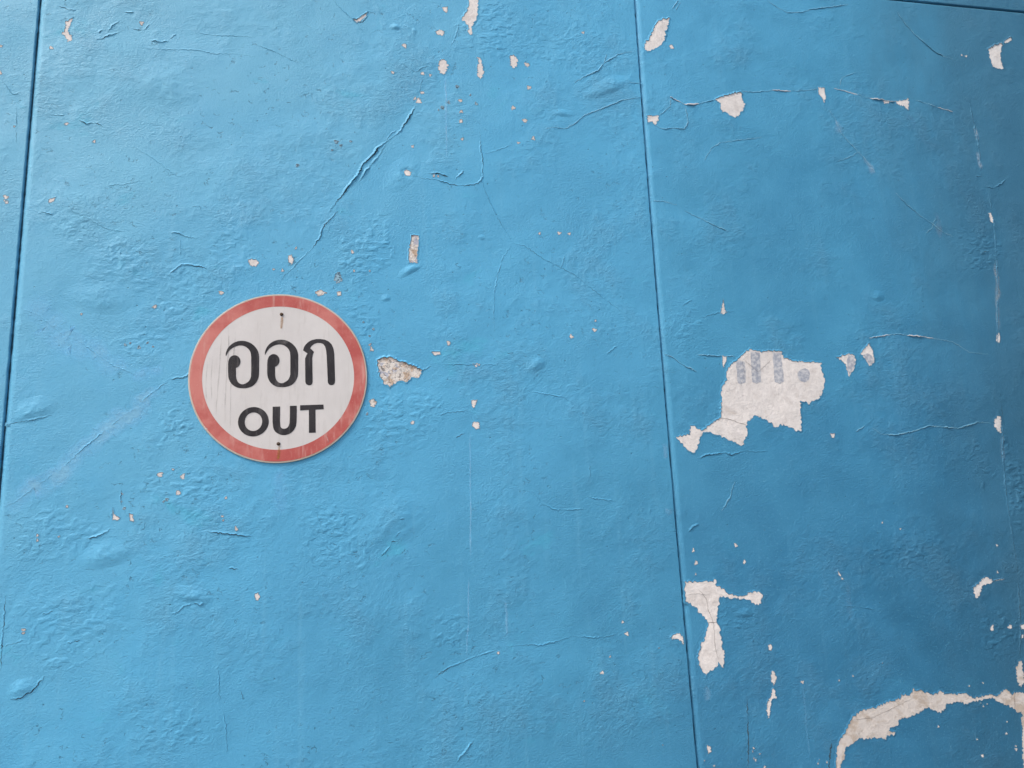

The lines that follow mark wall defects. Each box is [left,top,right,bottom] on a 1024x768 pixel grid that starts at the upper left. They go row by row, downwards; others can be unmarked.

peeling [642,16,675,52]
crack [655,96,714,130]
peeling [714,90,747,119]
peeling [986,36,1012,71]
crack [278,63,429,282]
crack [414,132,622,332]
crack [742,72,1009,354]
flaking render [362,320,423,389]
peeling [675,347,826,455]
crack [856,391,1022,658]
peeling [682,547,764,678]
peeling [816,659,1024,768]